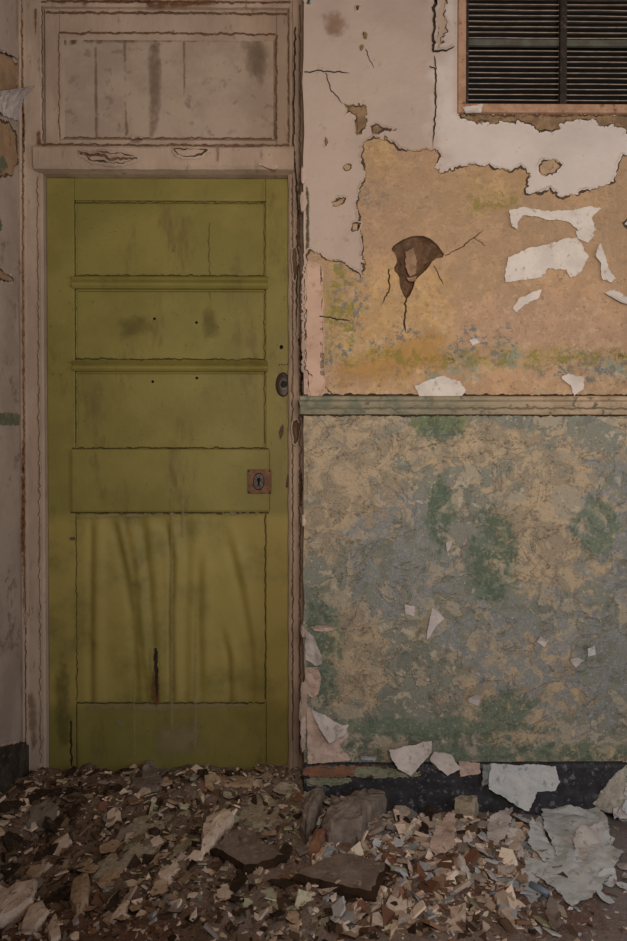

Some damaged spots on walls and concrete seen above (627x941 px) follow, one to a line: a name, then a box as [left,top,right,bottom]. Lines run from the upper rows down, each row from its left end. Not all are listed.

peeling [431,0,450,48]
peeling [0,48,35,181]
crack [292,27,349,396]
peeling [291,102,627,396]
crack [434,232,485,285]
crack [381,269,407,332]
peeling [427,608,445,639]
peeling [570,646,596,667]
peeling [299,625,461,788]
peeling [482,763,560,811]
spalling [593,759,627,822]